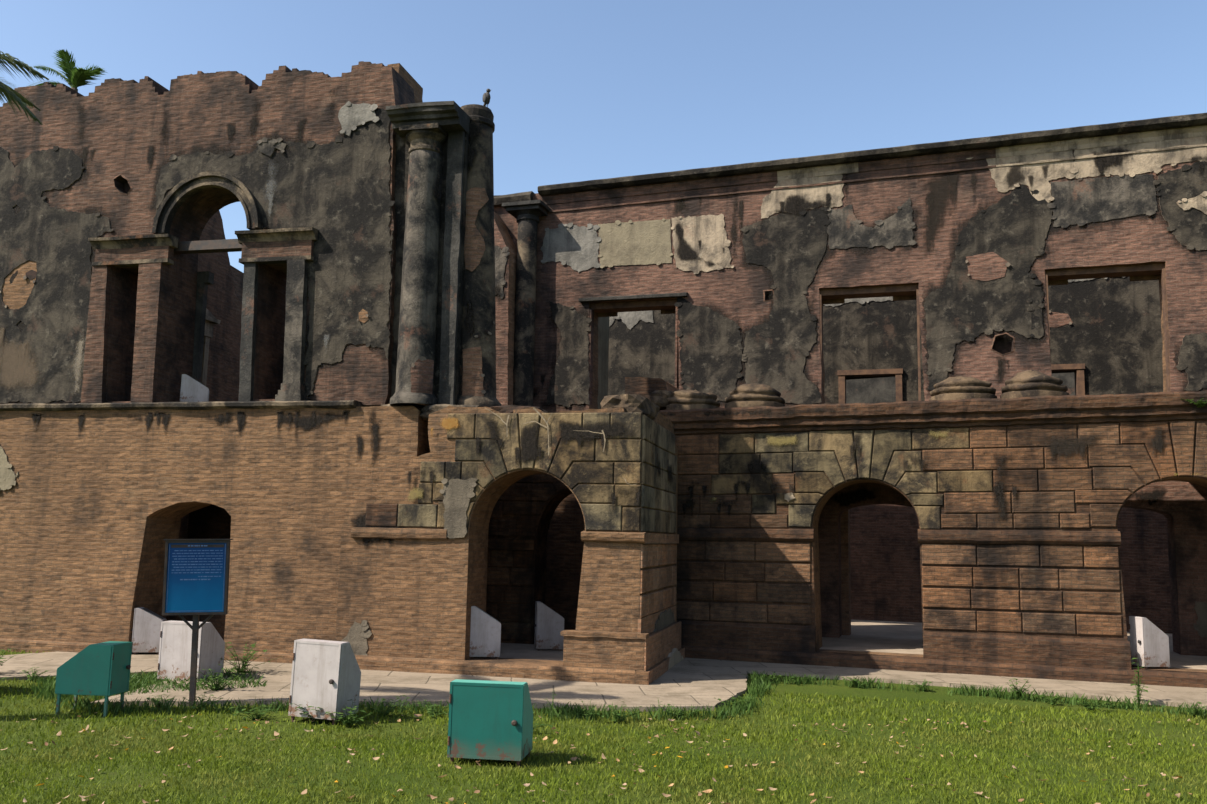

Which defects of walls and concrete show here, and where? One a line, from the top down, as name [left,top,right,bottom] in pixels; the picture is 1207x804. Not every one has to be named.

peeling [0,146,113,404]
peeling [150,101,395,401]
spalling [464,187,510,302]
peeling [540,174,918,409]
damp [776,175,848,215]
damp [925,173,977,252]
damp [1007,165,1048,187]
peeling [922,136,1207,392]
damp [1094,148,1129,178]
peeling [0,446,19,491]
damp [476,419,541,464]
damp [559,420,634,448]